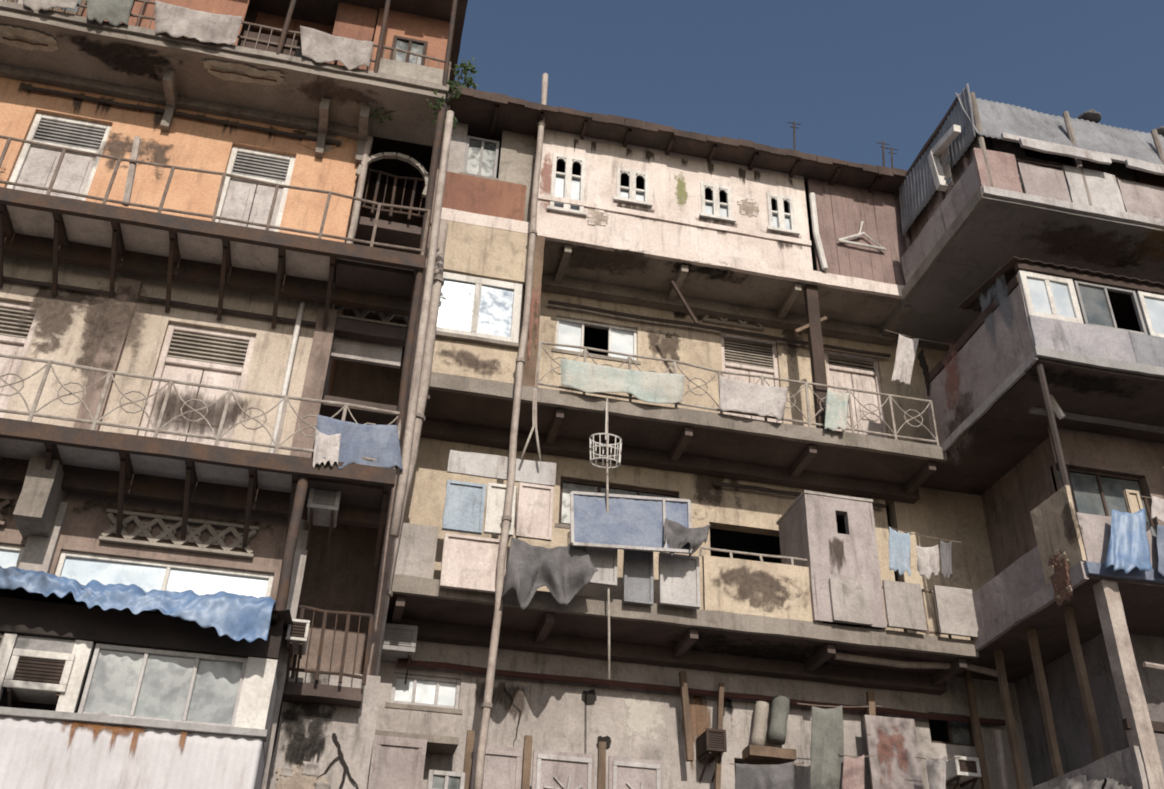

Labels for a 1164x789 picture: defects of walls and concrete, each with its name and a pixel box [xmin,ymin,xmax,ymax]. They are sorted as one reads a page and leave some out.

damp [56,35,182,81]
damp [20,286,147,369]
damp [440,350,499,374]
damp [648,330,679,366]
damp [714,566,799,612]
corrosion [63,722,144,754]
damp [280,701,336,765]
crack [316,733,359,789]
crack [503,687,521,747]